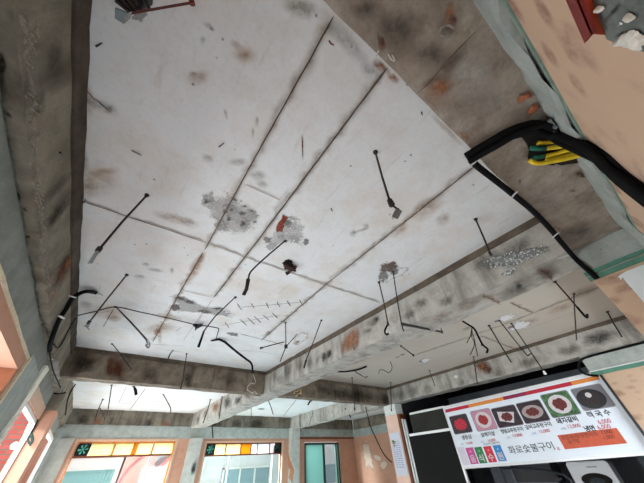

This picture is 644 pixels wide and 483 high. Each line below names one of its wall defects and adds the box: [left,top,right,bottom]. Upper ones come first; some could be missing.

spalling [202,192,257,231]
spalling [263,215,309,250]
peeling [379,262,408,282]
spalling [484,245,548,275]
rust [343,331,358,349]